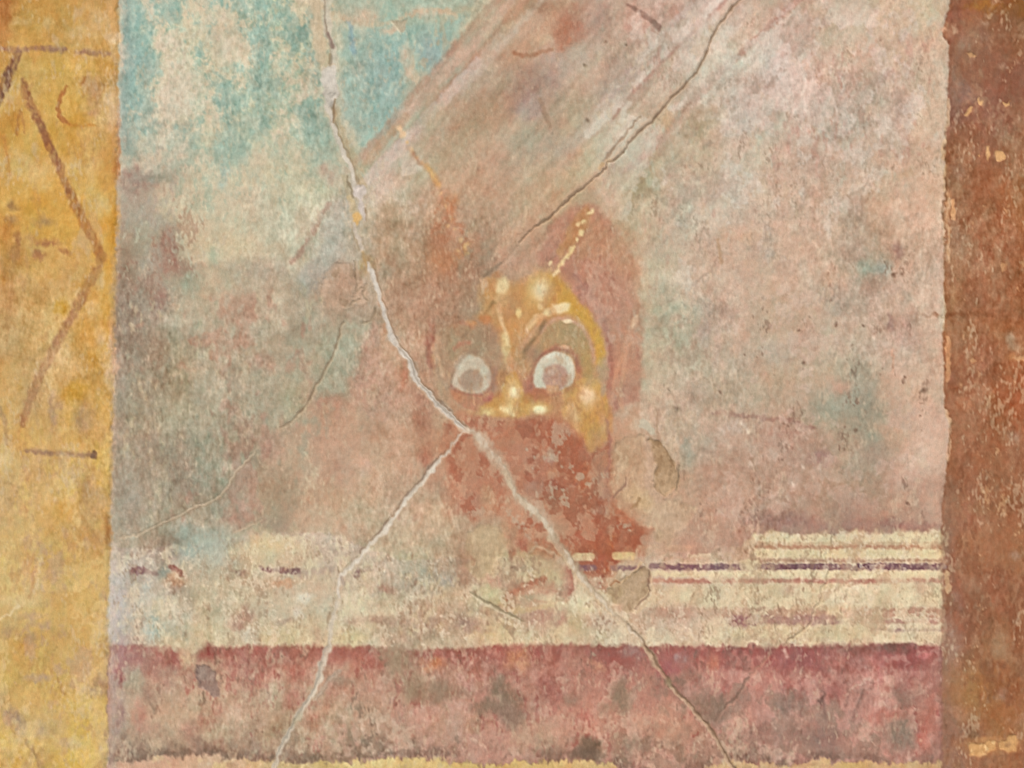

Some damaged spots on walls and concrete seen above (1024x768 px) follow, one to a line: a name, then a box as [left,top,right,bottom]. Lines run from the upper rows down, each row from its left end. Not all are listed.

crack [269,0,746,768]
spalling [608,405,698,550]
spalling [604,548,657,615]